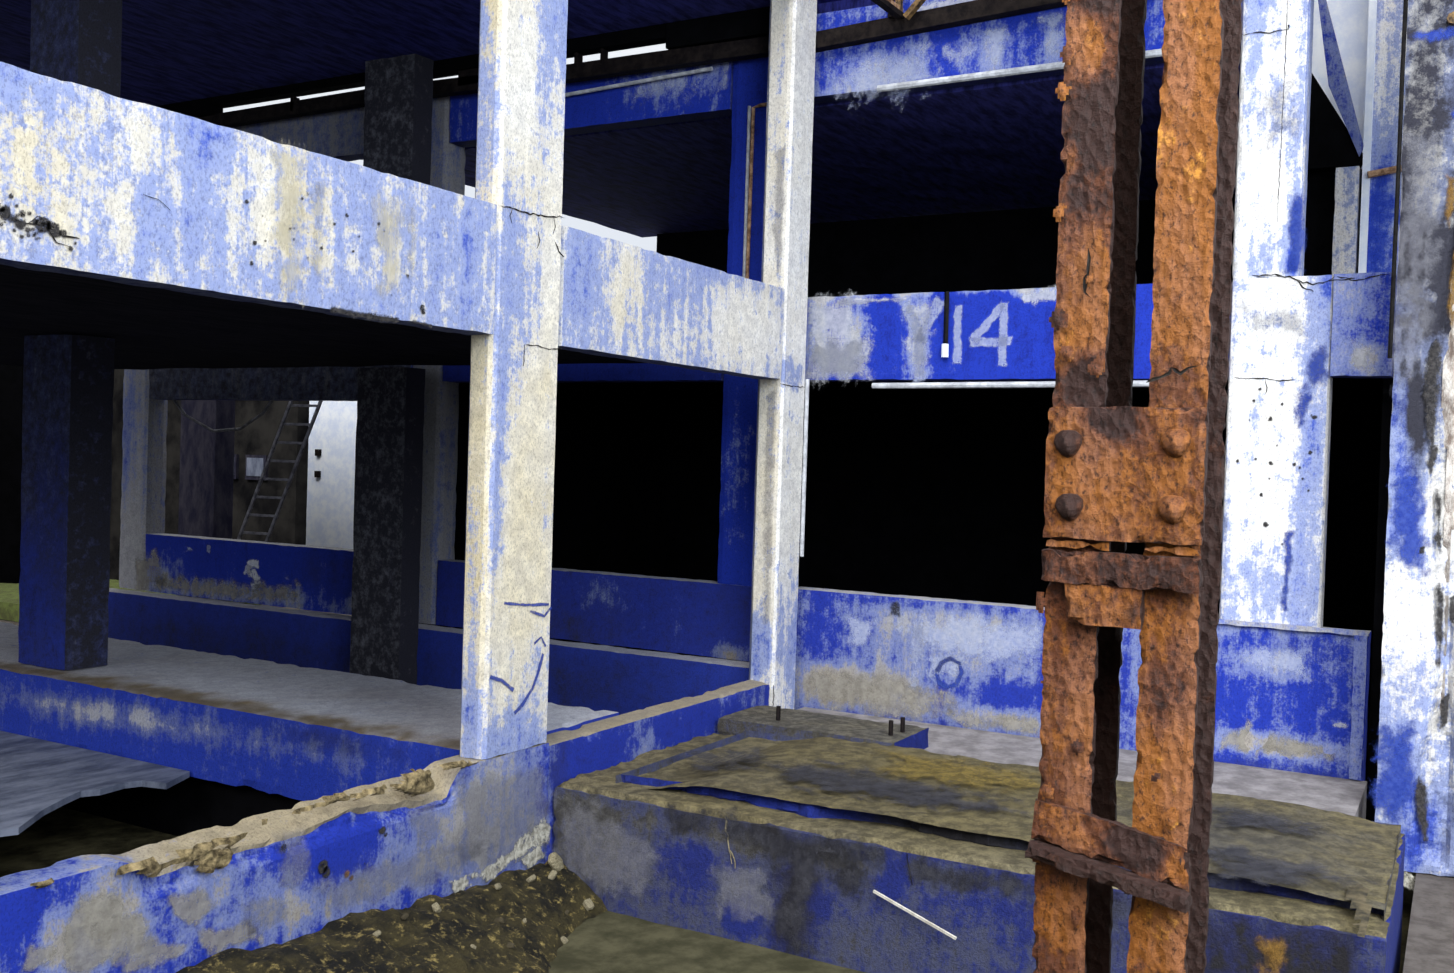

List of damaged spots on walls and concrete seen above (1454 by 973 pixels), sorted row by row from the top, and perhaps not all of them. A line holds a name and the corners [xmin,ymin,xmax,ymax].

rust [1055,45,1074,101]
spalling [0,193,77,251]
rust [1053,203,1067,222]
peeling [331,305,432,328]
rust [1049,308,1068,331]
rust [1088,353,1105,378]
rust [1036,592,1047,613]
rust [1070,738,1084,756]
spalling [292,759,478,814]